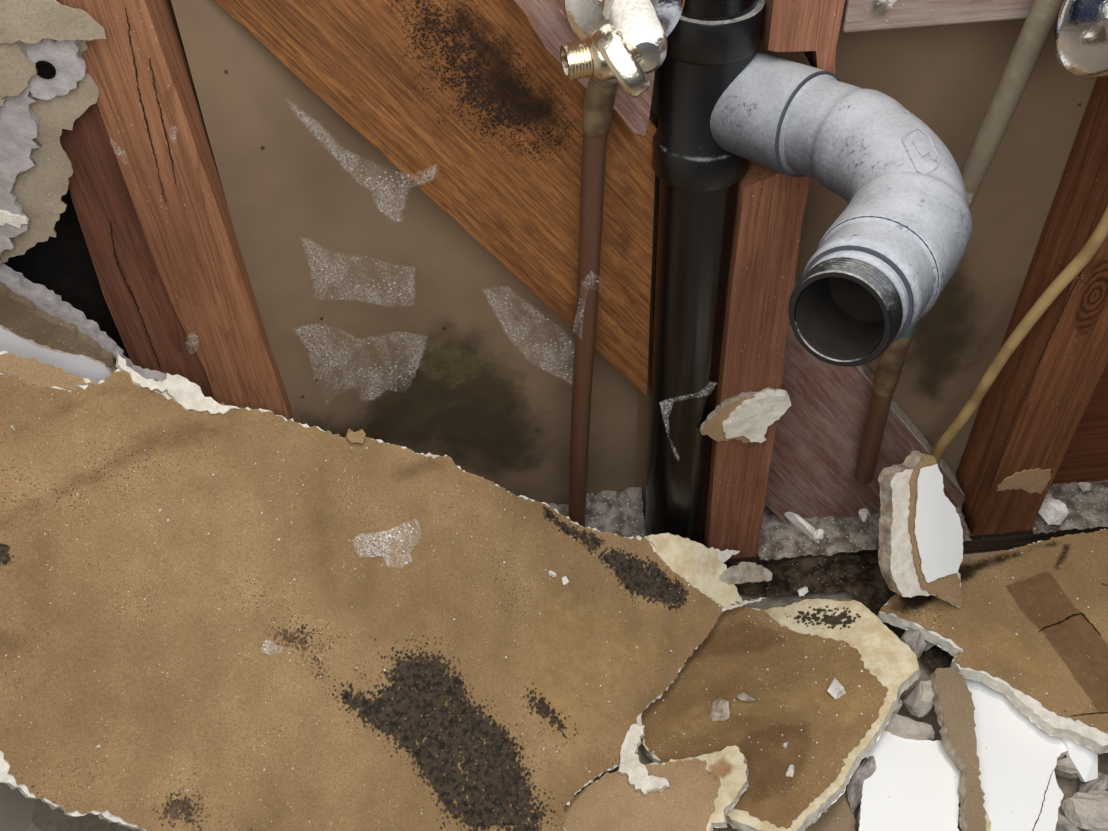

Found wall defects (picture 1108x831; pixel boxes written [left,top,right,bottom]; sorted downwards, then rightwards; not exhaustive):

leakage [384,0,581,171]
peeling [0,210,30,228]
spalling [0,281,116,366]
leakage [364,344,526,465]
crack [1038,613,1101,635]
leakage [267,609,564,831]
leakage [521,682,578,744]